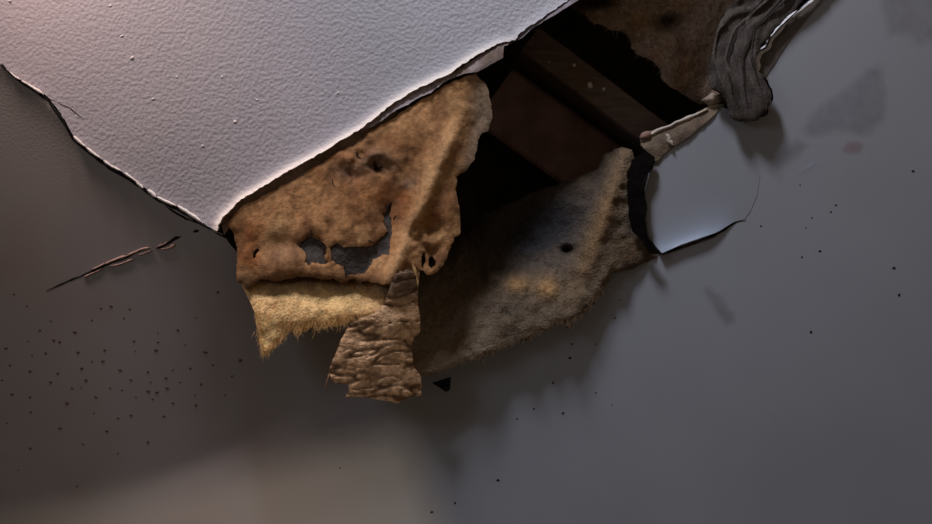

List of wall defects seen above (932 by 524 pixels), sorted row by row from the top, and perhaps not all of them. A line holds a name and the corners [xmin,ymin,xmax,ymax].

crack [1,64,236,290]
peeling [646,124,760,253]